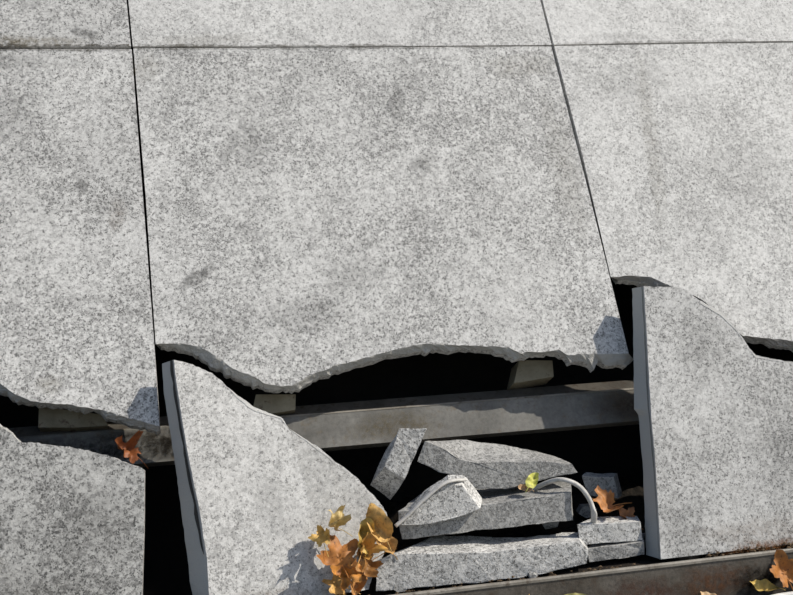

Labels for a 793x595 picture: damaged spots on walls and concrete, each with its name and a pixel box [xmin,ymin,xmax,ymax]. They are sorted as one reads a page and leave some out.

spalling [612,276,672,287]
spalling [745,336,793,347]
spalling [156,343,633,391]
spalling [0,383,160,432]